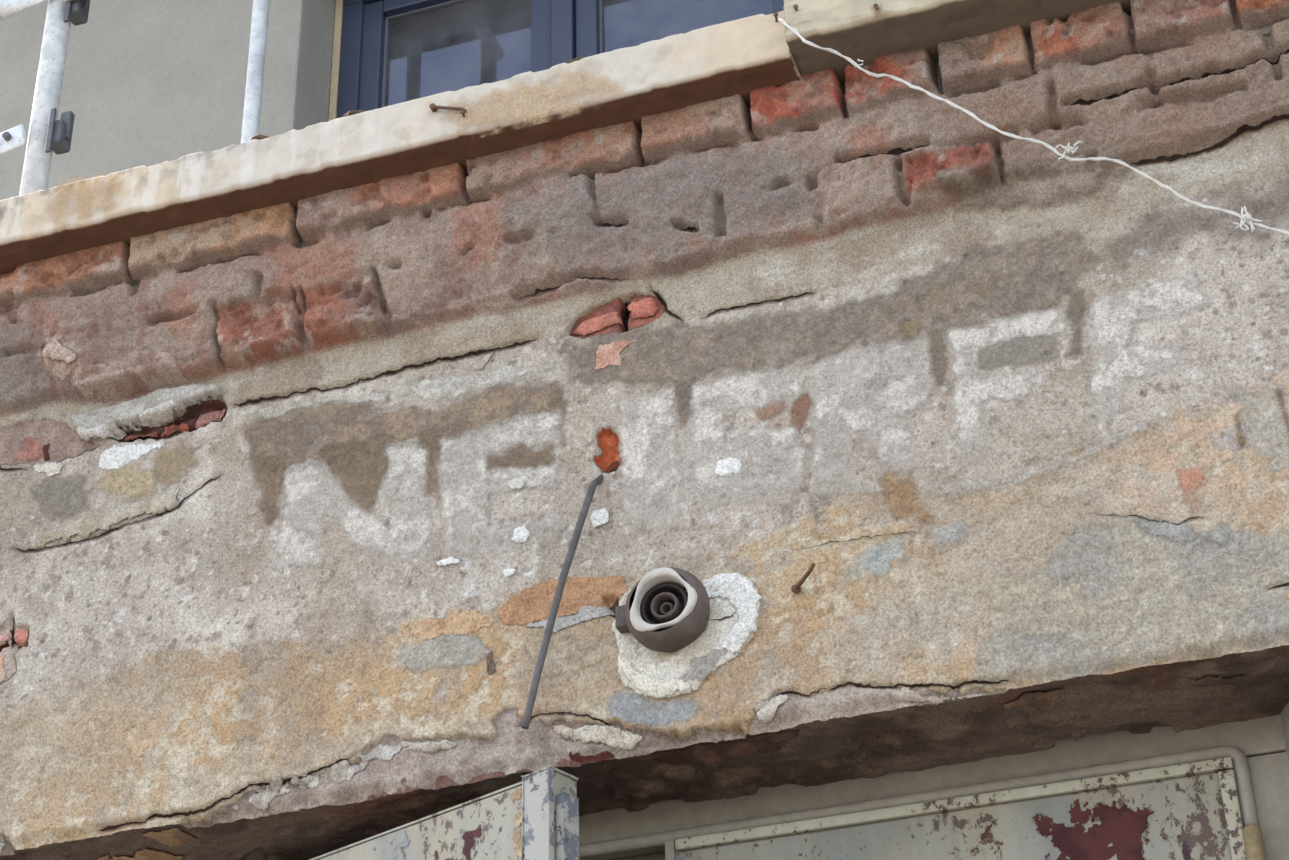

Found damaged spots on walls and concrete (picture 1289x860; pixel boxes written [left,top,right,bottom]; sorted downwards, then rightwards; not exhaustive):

spalling [569,294,665,370]
crack [234,339,536,406]
spalling [0,384,227,476]
spalling [594,427,623,472]
crack [14,474,222,555]
spalling [0,618,29,684]
crack [519,712,615,726]
crack [776,680,1010,697]
crack [97,754,356,831]